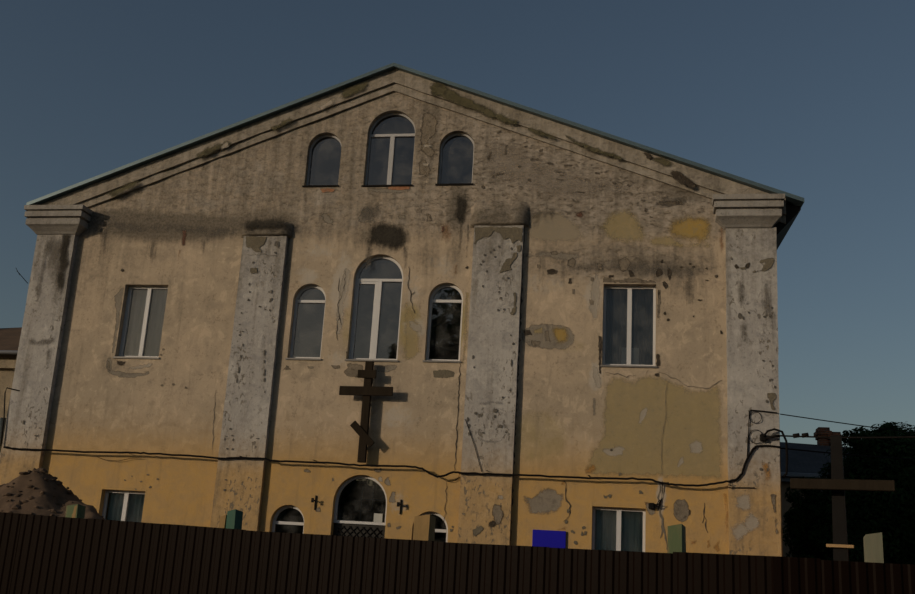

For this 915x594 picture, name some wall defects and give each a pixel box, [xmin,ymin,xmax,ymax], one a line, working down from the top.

damp [40,234,70,289]
damp [361,206,406,264]
damp [455,196,469,237]
peeling [510,324,574,349]
crack [605,372,722,550]
spalling [473,495,503,536]
peeling [525,489,587,545]
spalling [673,499,690,522]